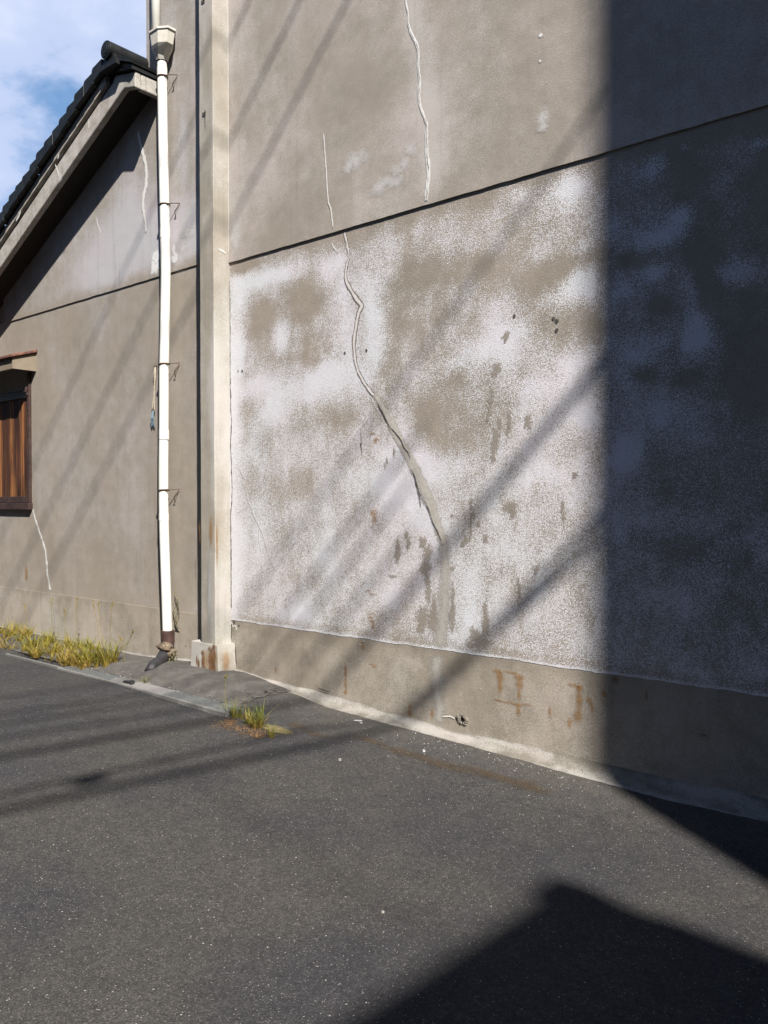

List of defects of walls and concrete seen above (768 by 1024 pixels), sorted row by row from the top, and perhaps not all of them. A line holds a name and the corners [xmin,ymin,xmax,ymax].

crack [137,131,148,232]
crack [405,0,431,200]
crack [323,134,451,723]
crack [32,509,55,627]